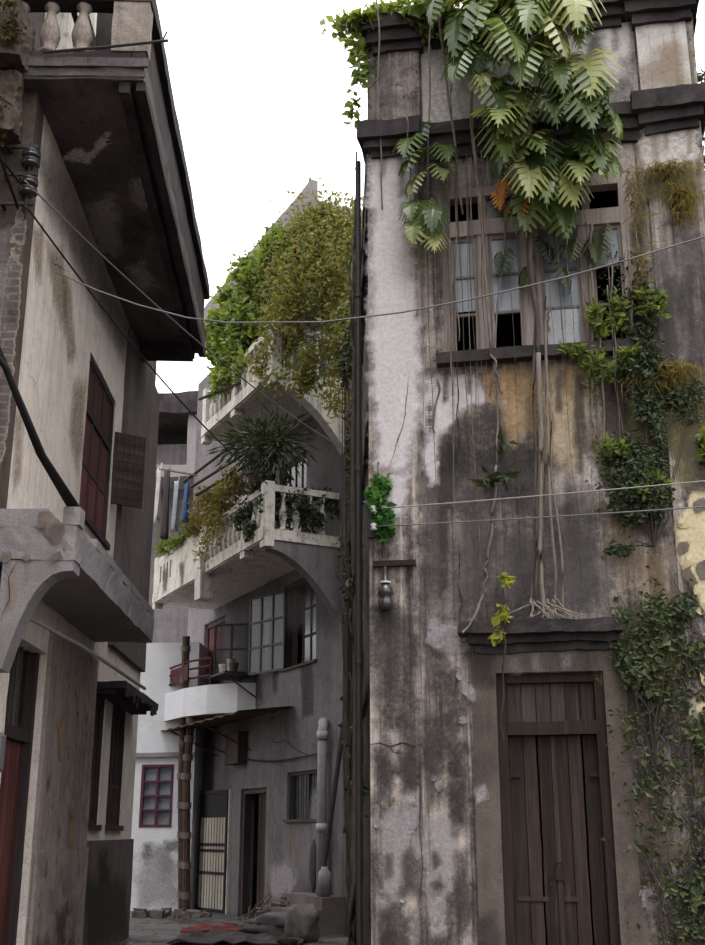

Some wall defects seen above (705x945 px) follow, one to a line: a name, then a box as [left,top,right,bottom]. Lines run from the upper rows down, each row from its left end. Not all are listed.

spalling [0,207,27,463]
damp [423,403,593,612]
damp [521,366,628,456]
damp [372,604,470,834]
crack [369,742,423,938]
damp [380,850,416,945]
damp [455,853,471,927]